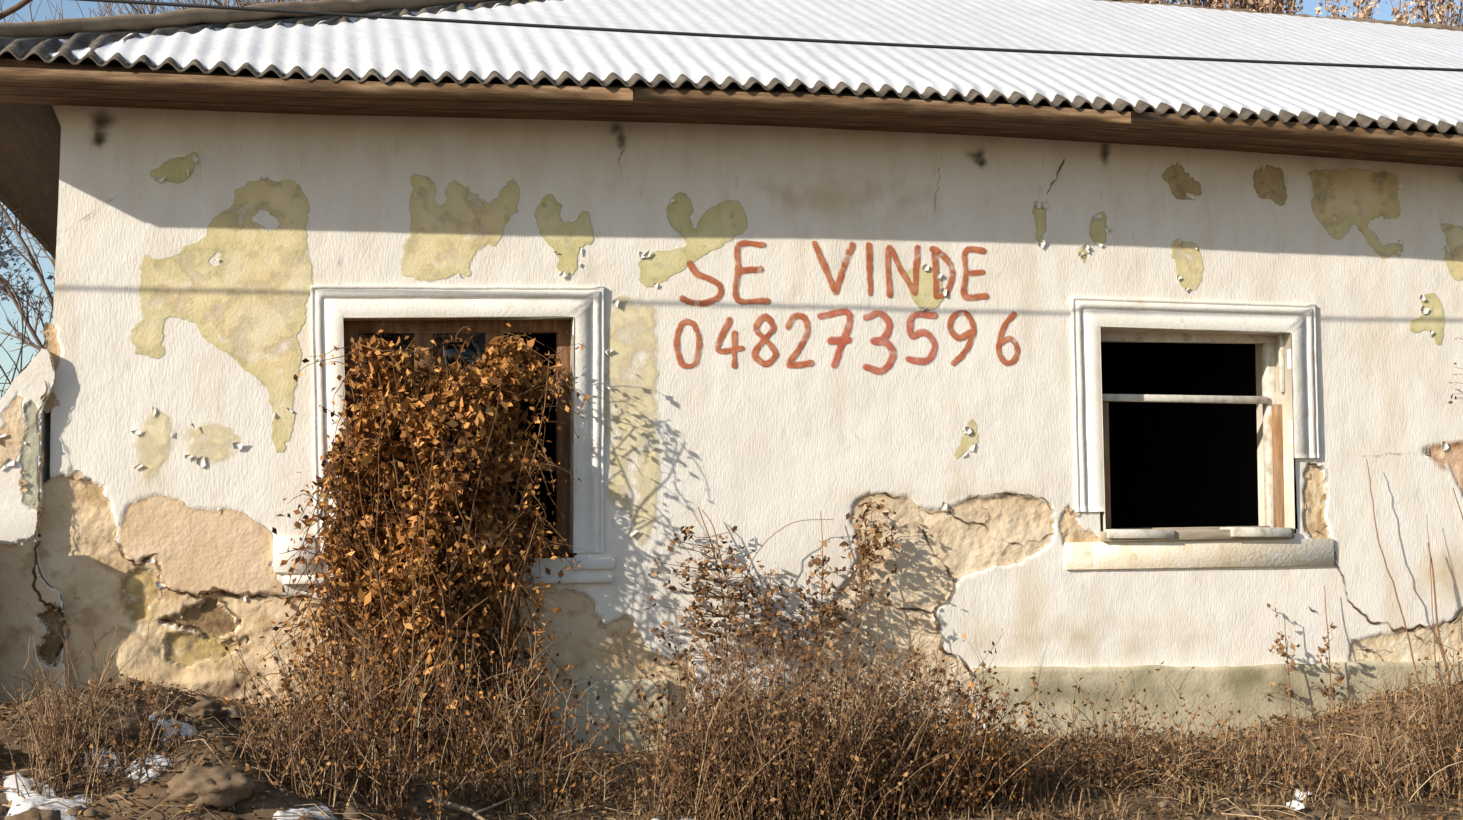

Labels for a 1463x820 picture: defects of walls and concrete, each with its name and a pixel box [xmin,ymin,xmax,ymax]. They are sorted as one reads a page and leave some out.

spalling [43,322,60,370]
peeling [130,174,313,452]
peeling [401,173,594,282]
peeling [603,193,747,544]
peeling [1309,168,1404,259]
crack [32,381,70,656]
spalling [0,388,368,712]
spalling [483,494,1100,752]
crack [871,492,1055,732]
spalling [1303,465,1330,539]
crack [1307,463,1463,661]
spalling [1349,609,1463,662]